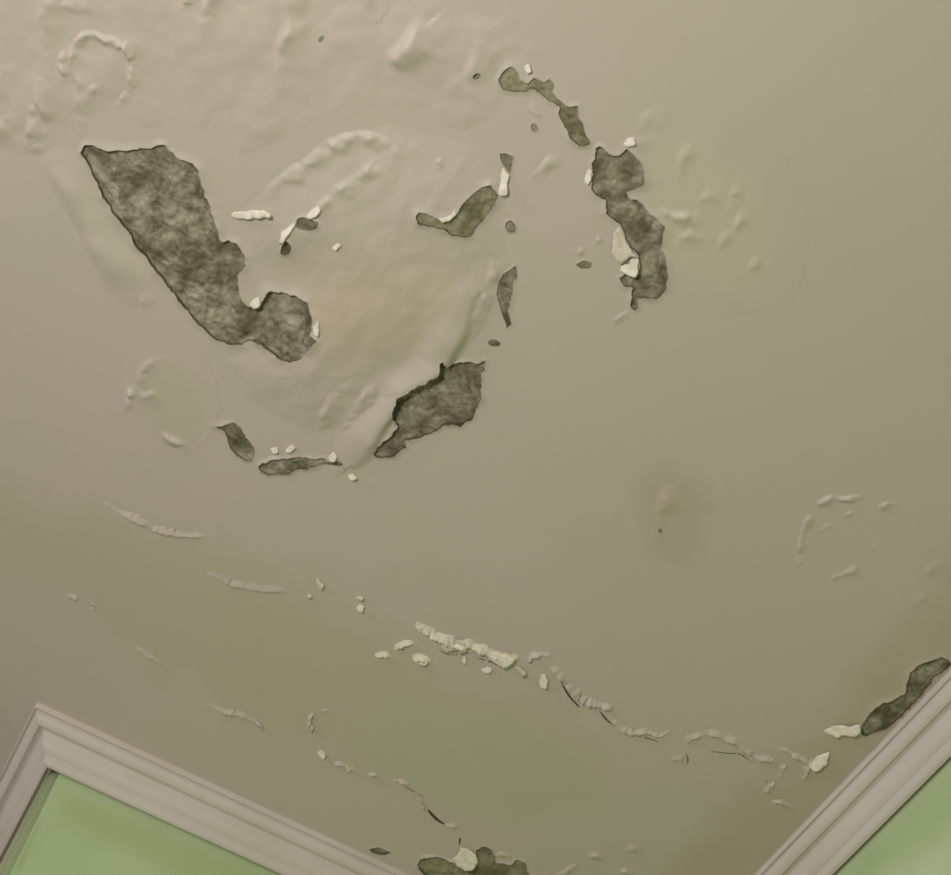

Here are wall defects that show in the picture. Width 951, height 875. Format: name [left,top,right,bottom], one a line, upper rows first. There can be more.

flaking render [407,151,519,241]
flaking render [494,60,668,314]
flaking render [76,137,320,372]
flaking render [373,262,520,461]
flaking render [212,419,357,481]
flaking render [824,657,951,738]
flaking render [415,845,534,875]